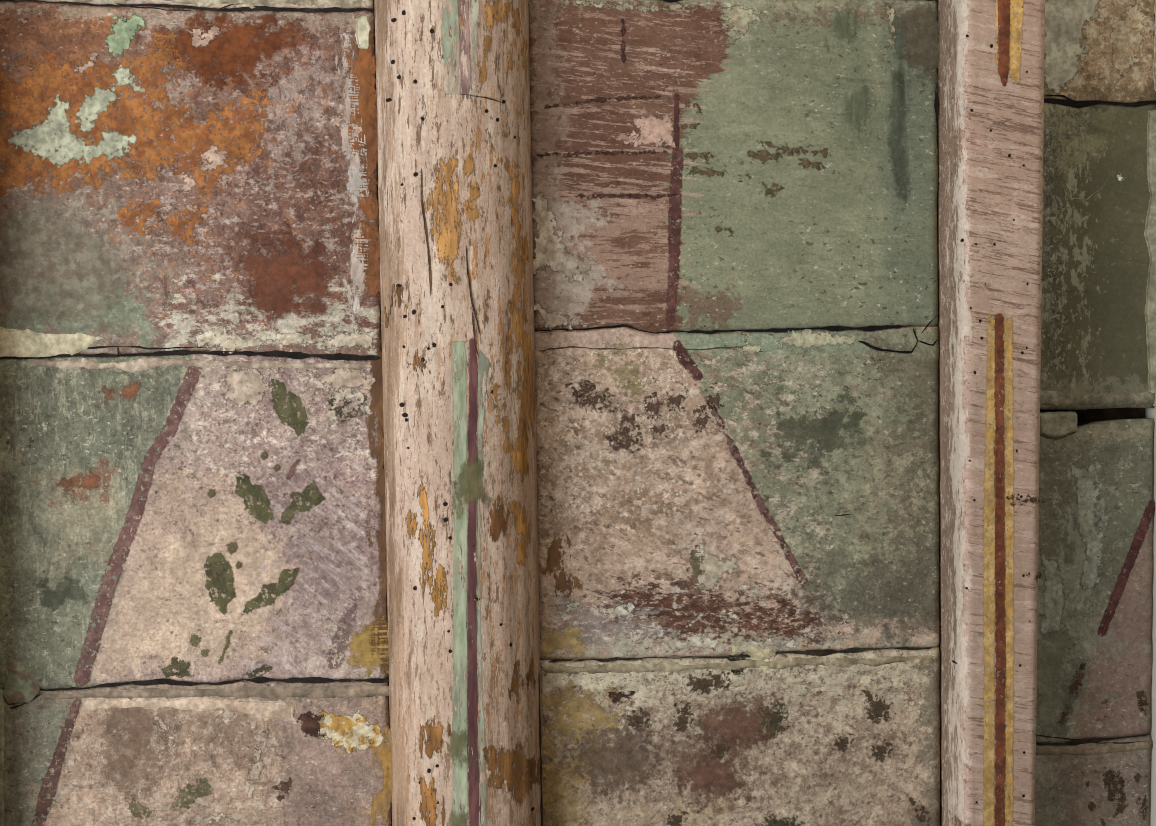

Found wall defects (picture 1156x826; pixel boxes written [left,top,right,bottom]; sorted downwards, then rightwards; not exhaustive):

crack [0,0,375,13]
rust [0,13,298,244]
rust [344,22,381,306]
peeling [537,102,784,203]
peeling [425,155,483,283]
rust [226,221,328,323]
crack [0,346,381,361]
crack [538,319,938,354]
peeling [402,469,449,617]
crack [10,677,389,708]
peeling [419,715,452,759]
crack [539,647,931,826]